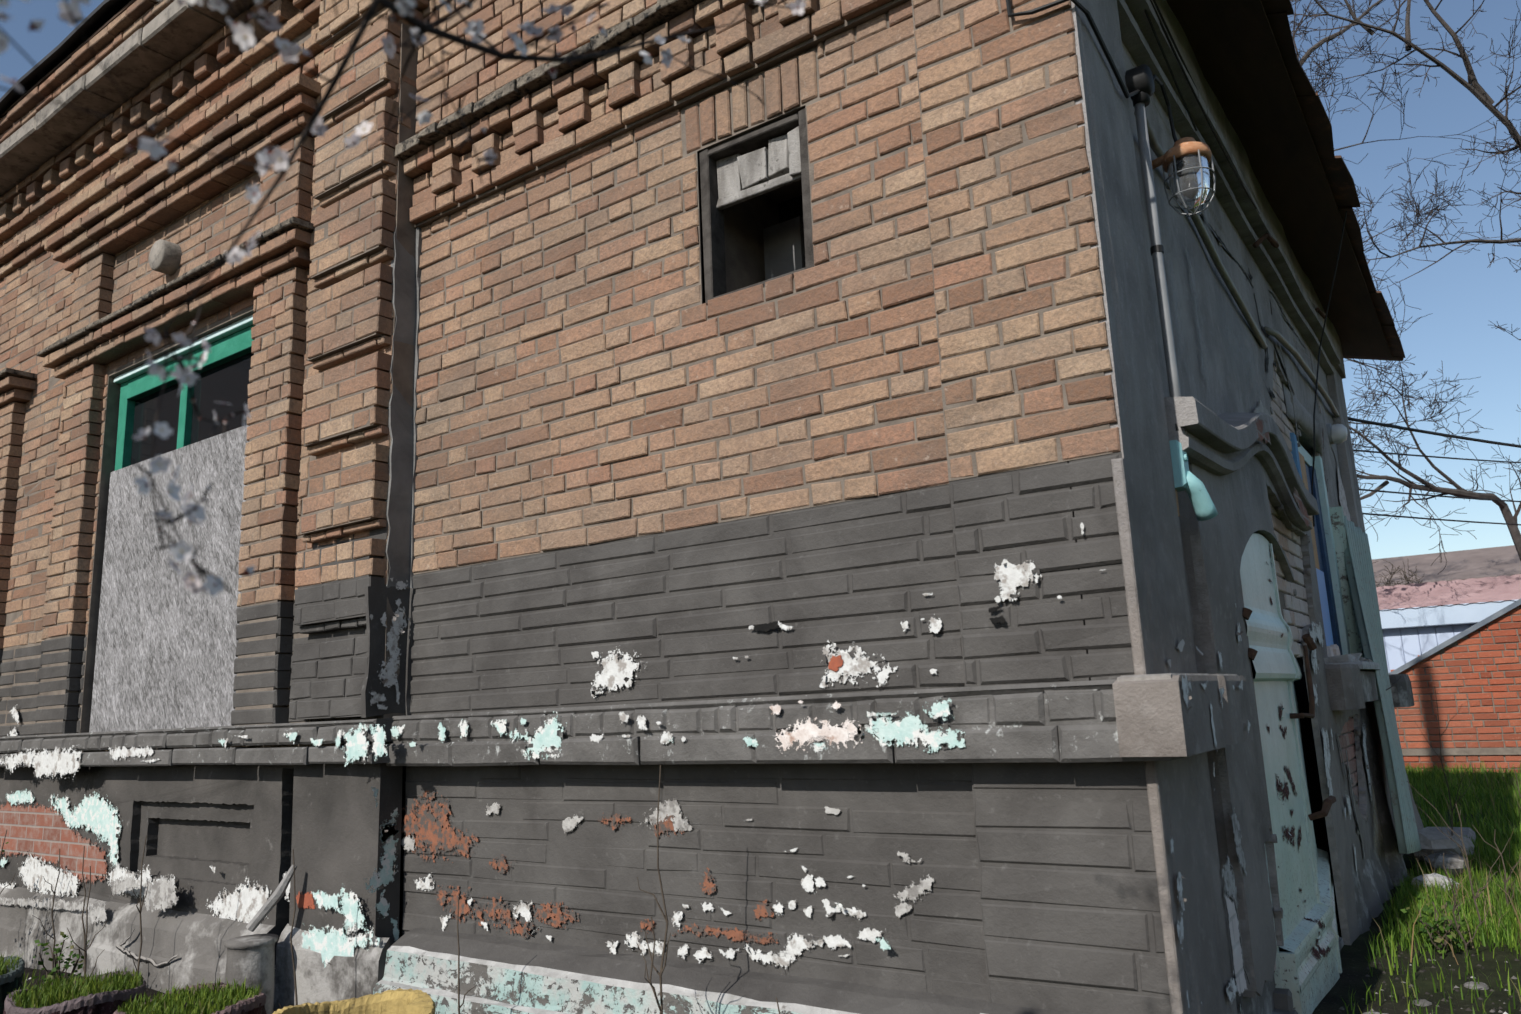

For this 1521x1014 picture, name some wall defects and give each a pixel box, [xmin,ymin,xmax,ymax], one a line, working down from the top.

crack [1198,209,1306,395]
peeling [989,558,1042,624]
peeling [283,577,416,767]
peeling [438,719,469,743]
peeling [490,711,564,760]
peeling [590,649,642,698]
peeling [619,712,686,744]
peeling [743,640,966,753]
spalling [0,706,179,924]
peeling [562,798,692,839]
peeling [205,787,579,967]
peeling [605,848,934,970]